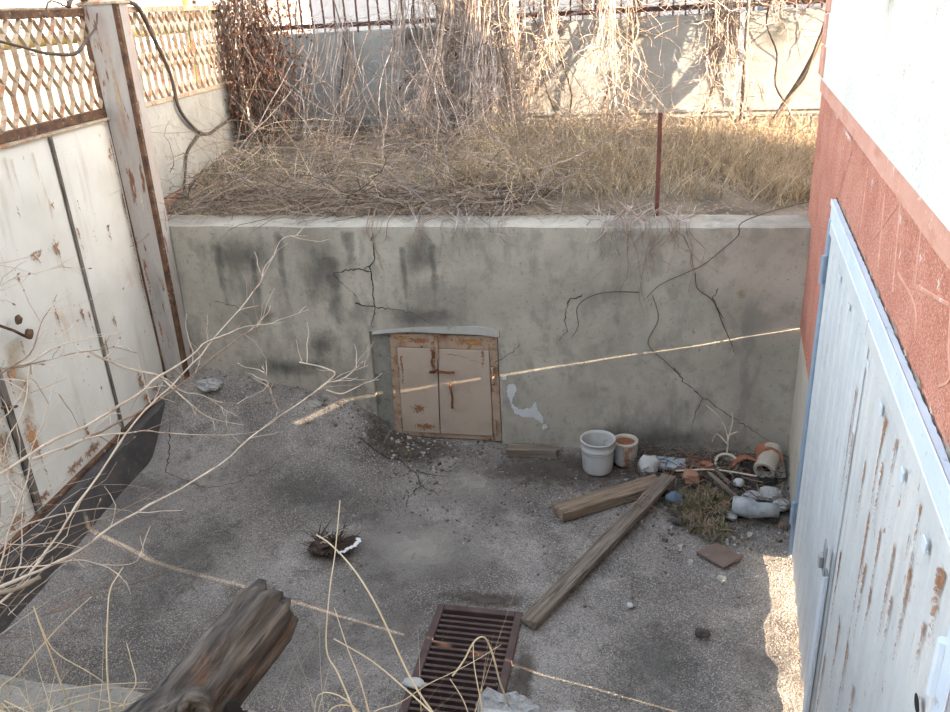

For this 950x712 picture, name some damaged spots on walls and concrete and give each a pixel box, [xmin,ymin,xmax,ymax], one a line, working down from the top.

crack [333,235,428,327]
peeling [501,375,548,429]
rust [25,419,51,502]
rust [816,416,897,712]
rust [879,505,922,635]
rust [916,567,946,657]